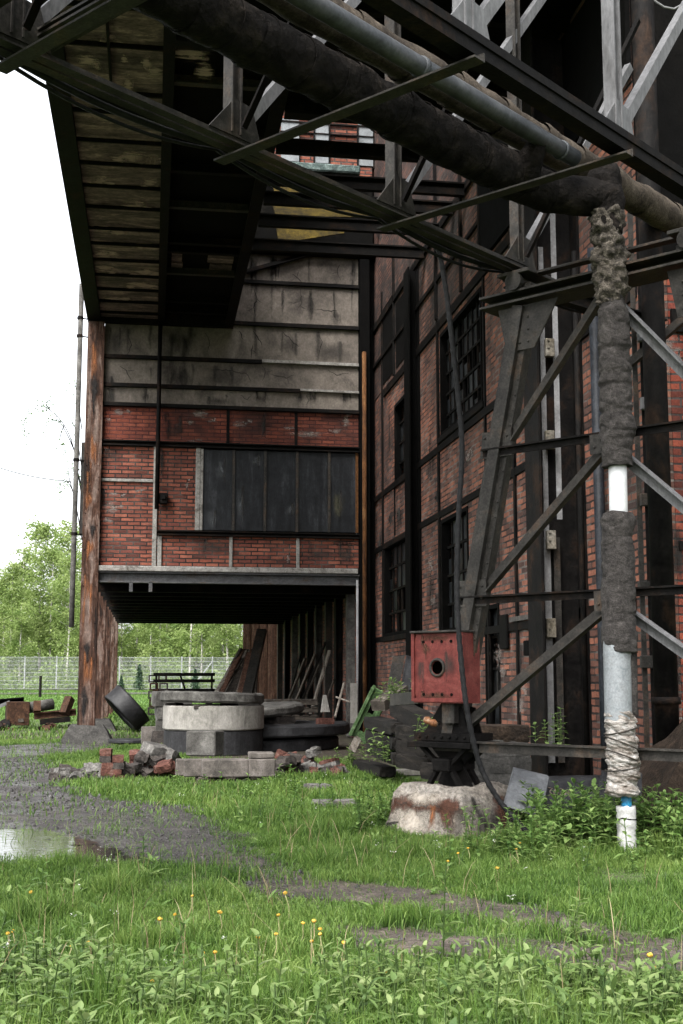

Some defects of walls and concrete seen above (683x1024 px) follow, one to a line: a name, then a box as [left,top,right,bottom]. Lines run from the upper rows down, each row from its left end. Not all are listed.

crack [205,274,348,400]